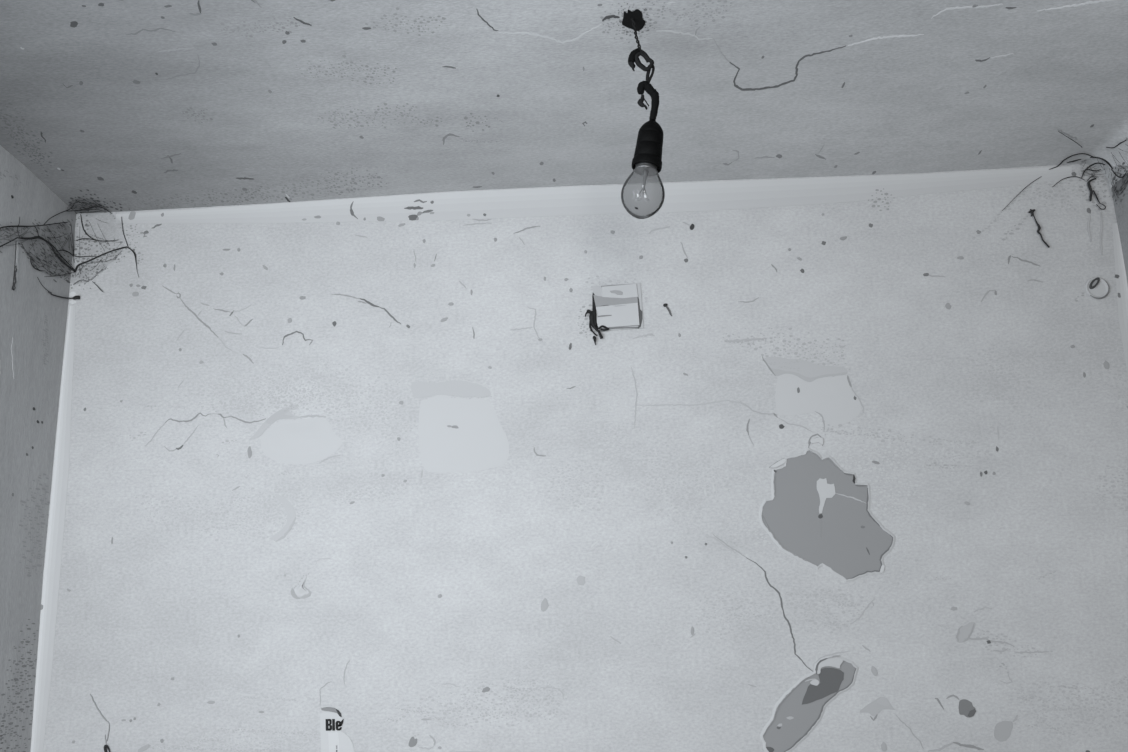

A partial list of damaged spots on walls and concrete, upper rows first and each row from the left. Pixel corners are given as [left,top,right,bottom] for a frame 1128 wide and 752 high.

crack [477,10,603,44]
crack [659,0,1113,91]
crack [724,338,776,376]
crack [129,402,325,456]
crack [631,367,902,566]
peeling [758,448,896,582]
crack [706,534,875,736]
peeling [760,655,859,752]